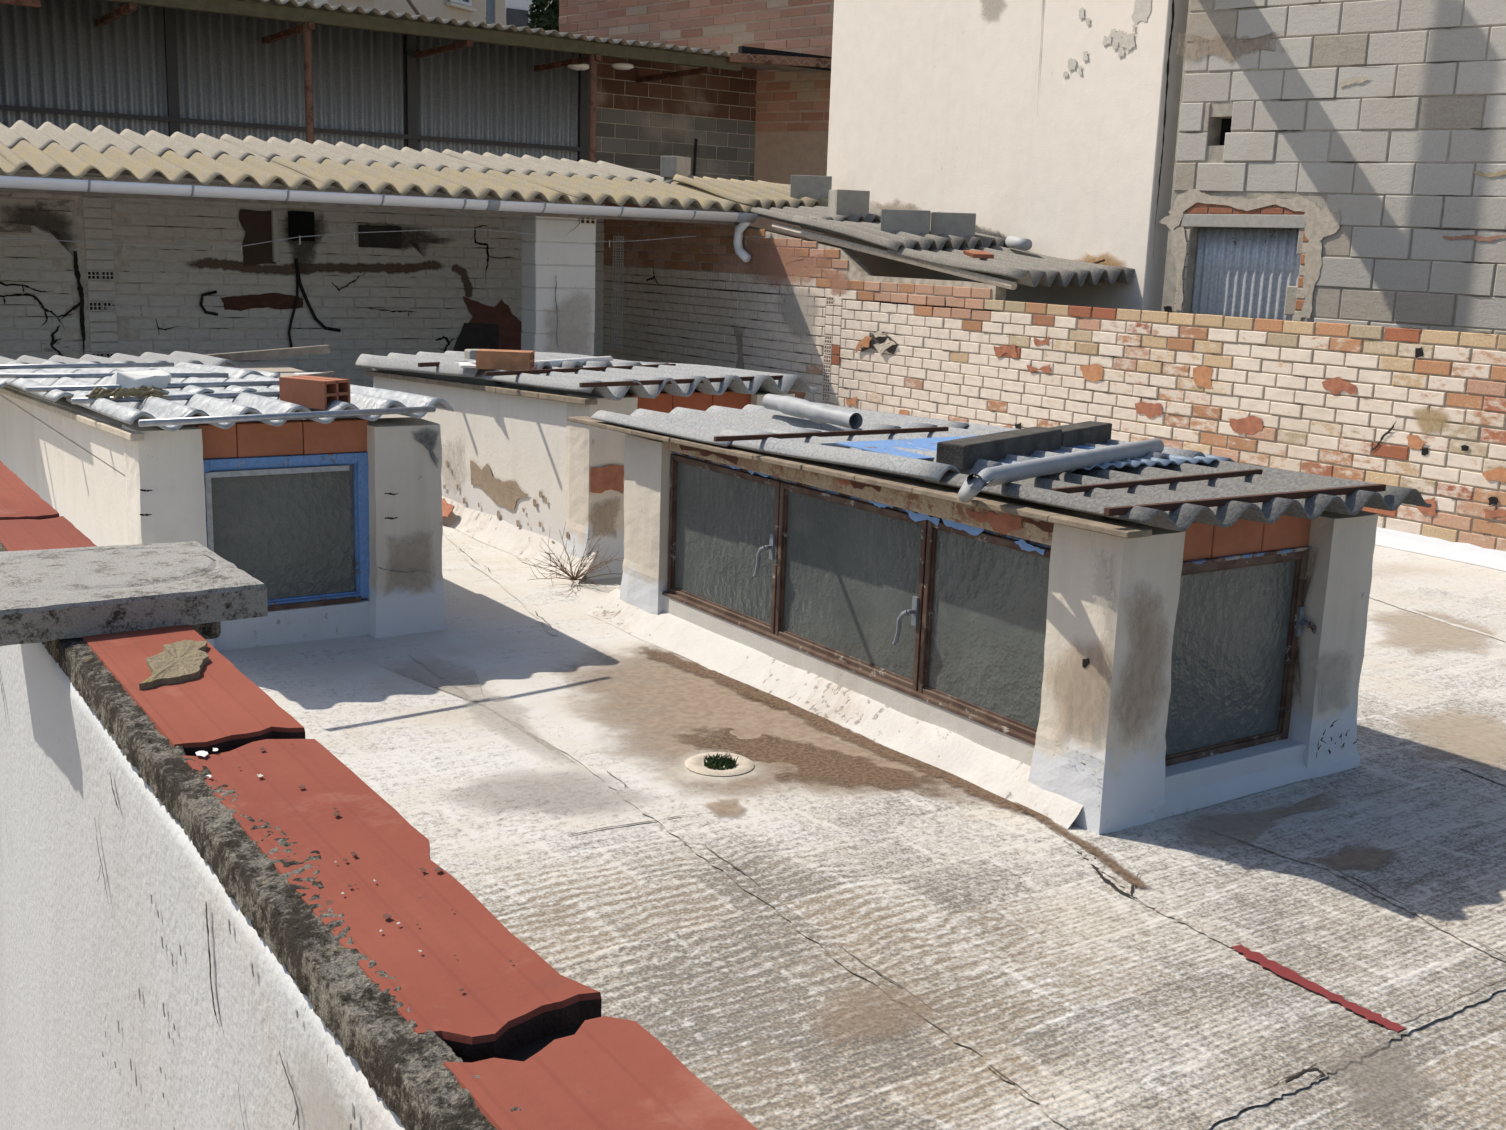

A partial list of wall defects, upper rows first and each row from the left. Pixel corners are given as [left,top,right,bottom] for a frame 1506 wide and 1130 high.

crack [0,251,85,356]
spalling [453,296,522,352]
damp [414,430,438,465]
flaking render [442,460,547,528]
damp [1046,596,1167,736]
damp [577,648,1148,887]
crack [1091,864,1141,902]